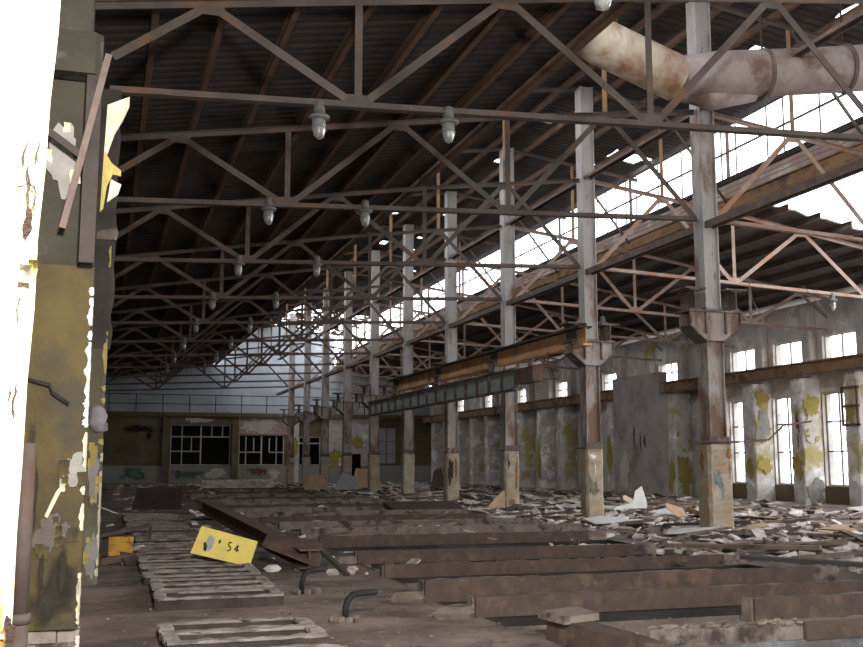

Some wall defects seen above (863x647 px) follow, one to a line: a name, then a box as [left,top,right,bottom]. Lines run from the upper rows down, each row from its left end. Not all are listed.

crack [16,140,40,210]
peeling [46,122,81,200]
peeling [32,287,103,647]